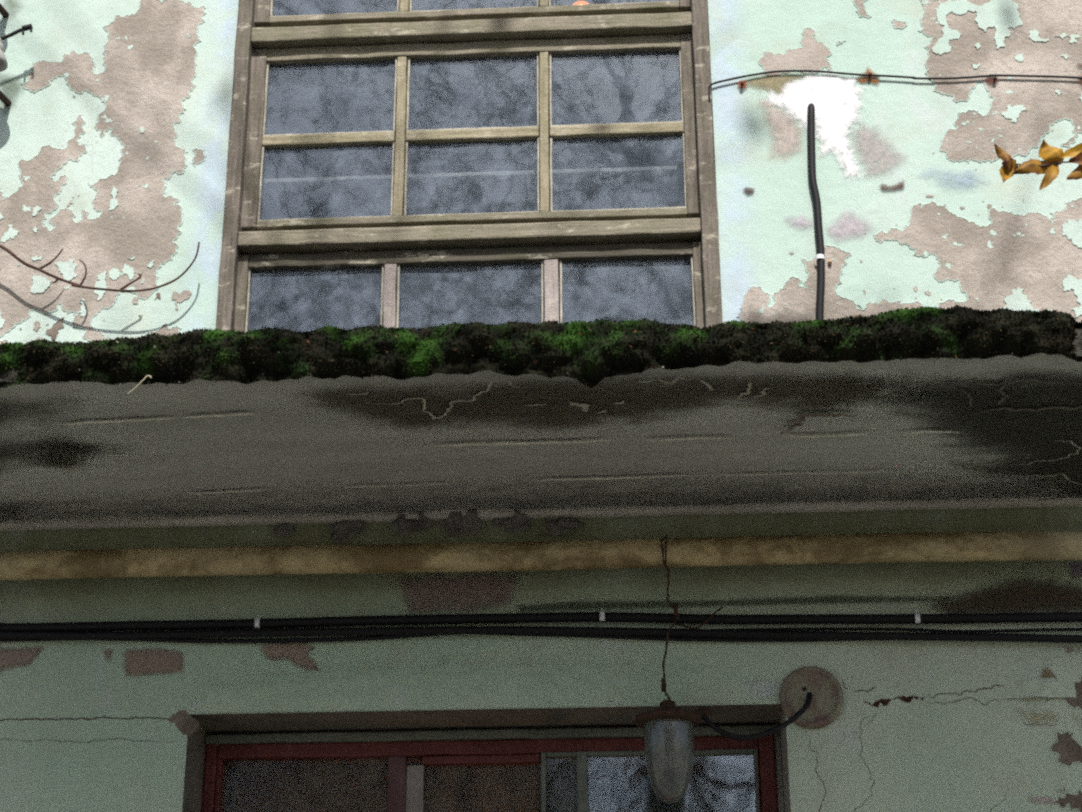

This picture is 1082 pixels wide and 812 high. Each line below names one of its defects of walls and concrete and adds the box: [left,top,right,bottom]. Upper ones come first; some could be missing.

damp [749,74,803,154]
peeling [758,27,845,77]
peeling [891,0,1082,170]
peeling [0,0,207,344]
peeling [736,195,1082,323]
damp [0,442,92,469]
damp [60,413,253,425]
damp [316,374,1082,498]
crack [0,716,174,743]
crack [809,740,826,811]
crack [842,681,1005,812]
peeling [1049,731,1082,768]